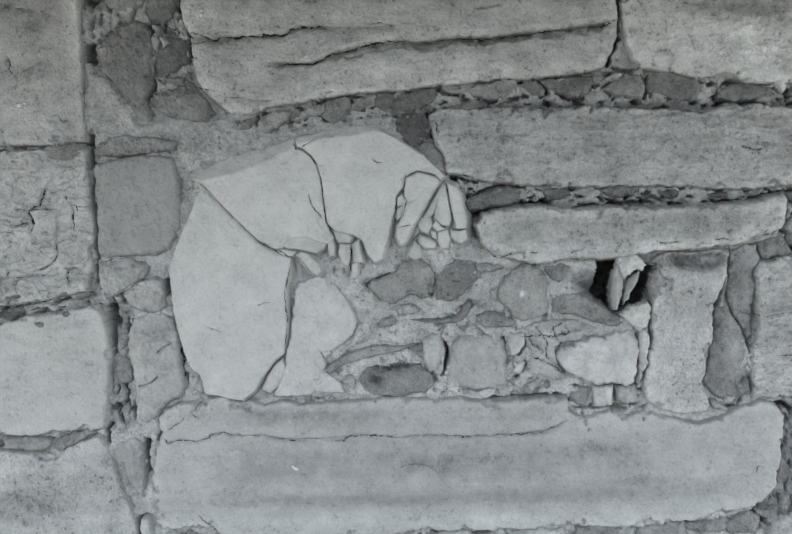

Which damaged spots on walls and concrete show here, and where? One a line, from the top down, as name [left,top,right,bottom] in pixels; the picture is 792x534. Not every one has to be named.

crack [196,26,340,42]
crack [273,0,641,68]
crack [0,189,80,233]
crack [294,137,332,233]
crack [395,171,505,231]
crack [6,244,123,307]
crack [220,203,315,375]
peeling [606,254,665,385]